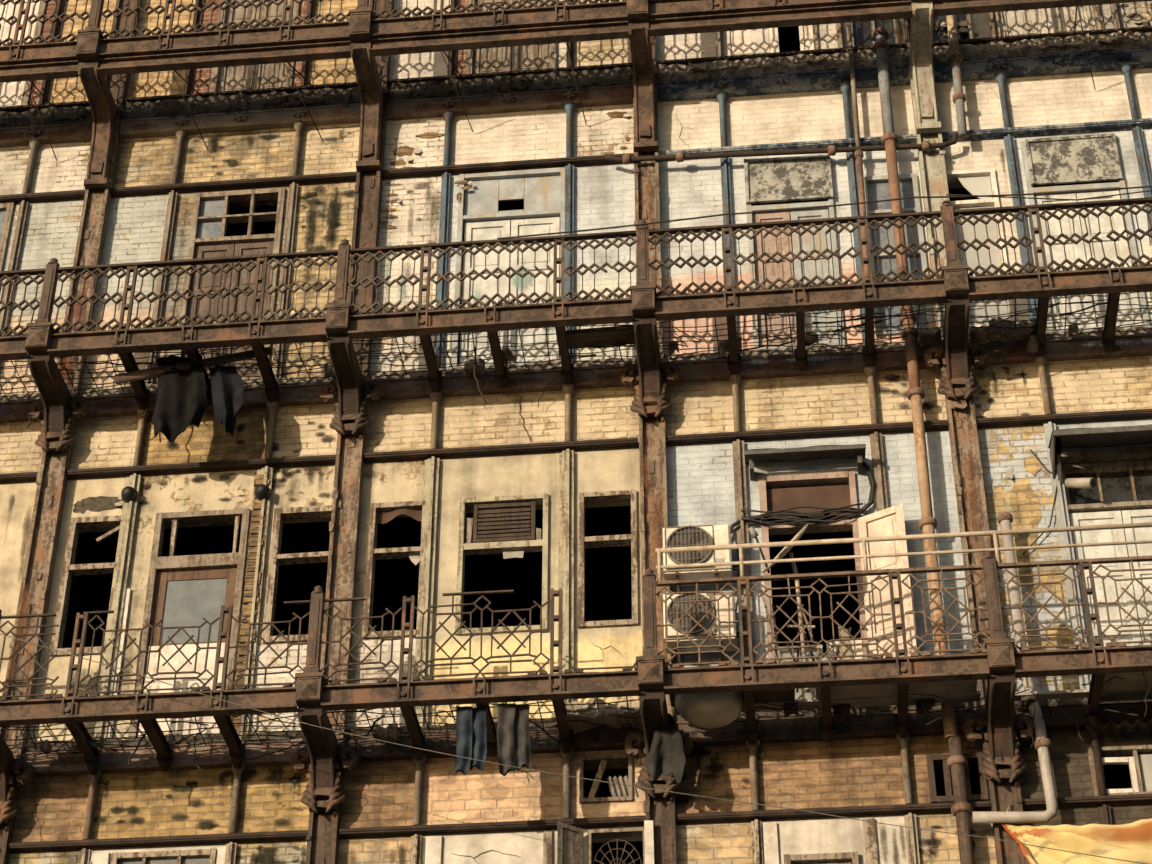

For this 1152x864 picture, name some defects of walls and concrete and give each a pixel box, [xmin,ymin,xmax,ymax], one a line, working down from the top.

spalling [166,93,350,117]
mould [236,845,306,864]